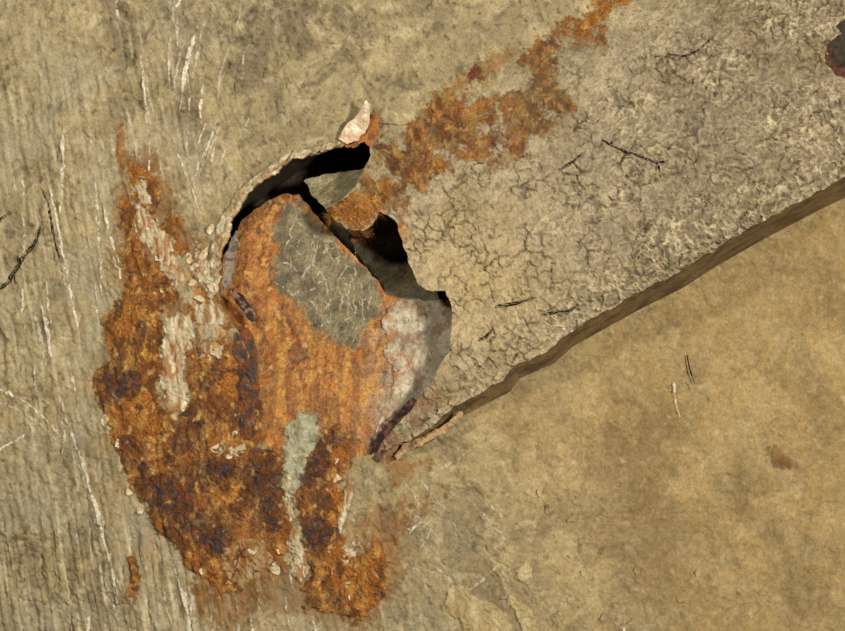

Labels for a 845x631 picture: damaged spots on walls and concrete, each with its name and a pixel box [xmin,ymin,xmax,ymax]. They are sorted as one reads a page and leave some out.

rust [322,0,630,247]
crack [602,128,666,171]
peeling [131,176,236,414]
crack [496,298,577,316]
rust [89,159,388,626]
peeling [210,430,247,459]
peeling [220,410,323,587]
peeling [333,474,355,533]
peeling [341,541,361,565]